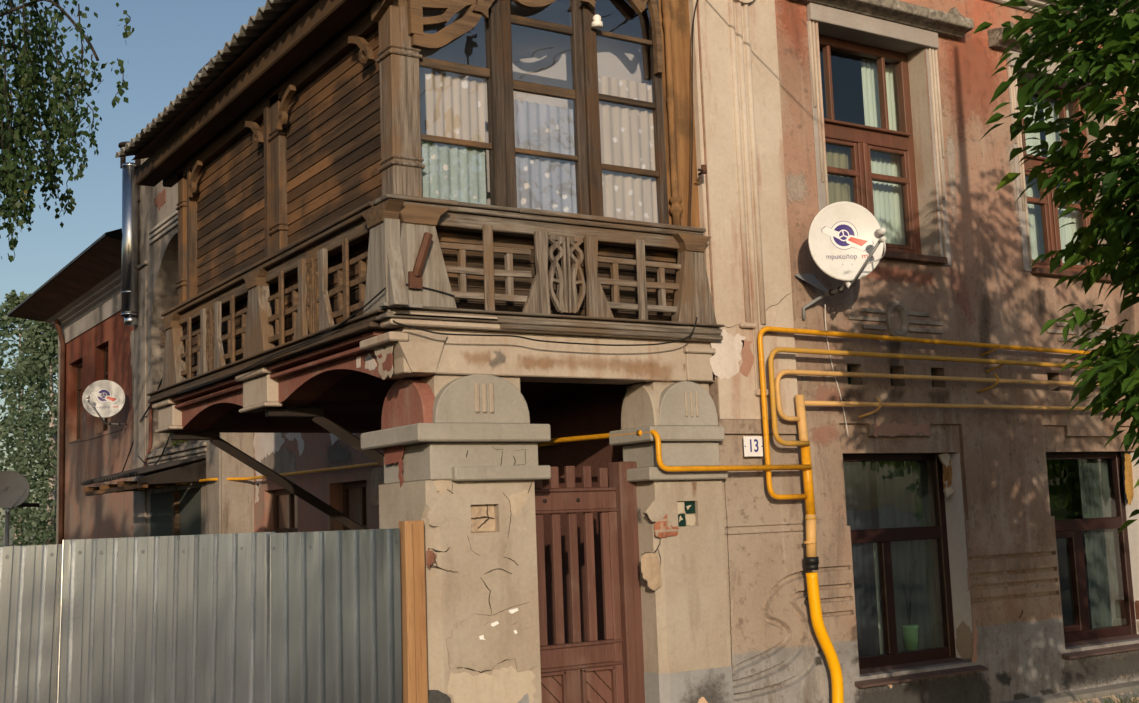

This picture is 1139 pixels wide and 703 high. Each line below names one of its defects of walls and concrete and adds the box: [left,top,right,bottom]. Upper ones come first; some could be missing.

peeling [356,344,393,380]
peeling [710,329,754,380]
peeling [253,433,305,503]
flaking render [654,514,679,538]
crack [428,538,529,616]
spalling [641,552,661,590]
peeling [428,619,538,703]